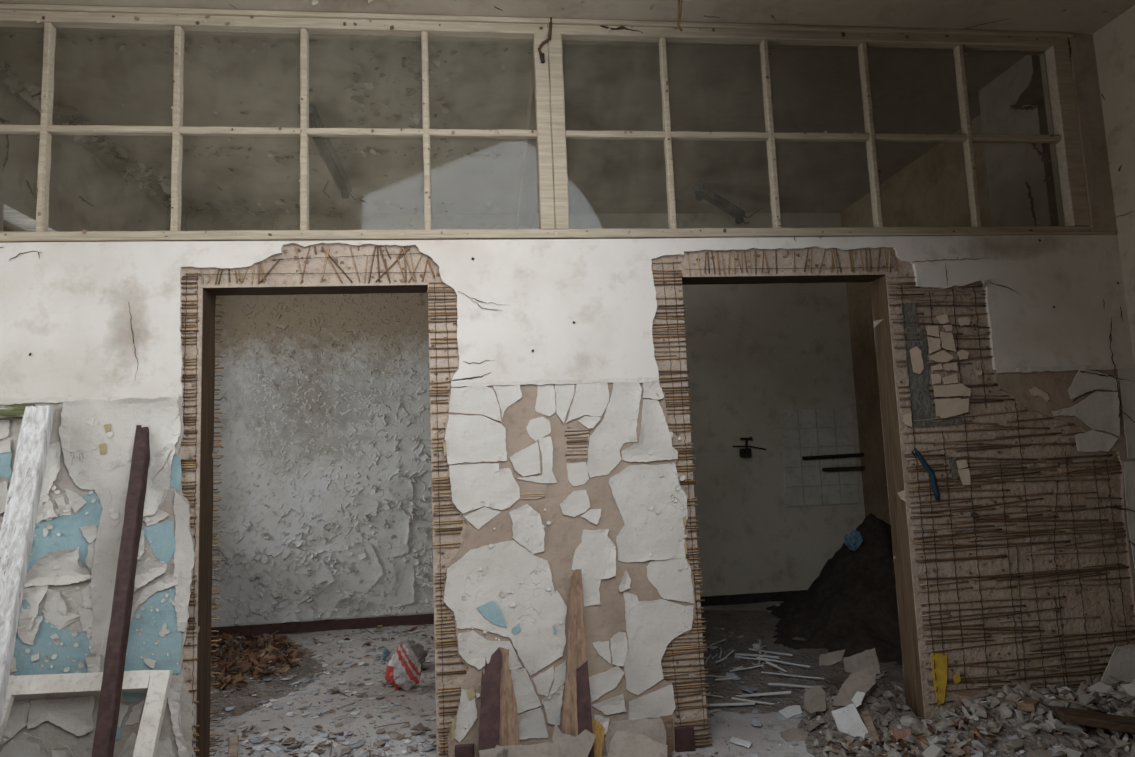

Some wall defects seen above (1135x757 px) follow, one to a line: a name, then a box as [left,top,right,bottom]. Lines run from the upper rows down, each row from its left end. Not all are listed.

peeling [0,60,518,236]
peeling [335,43,531,188]
flaking render [1012,65,1045,109]
peeling [0,246,1135,757]